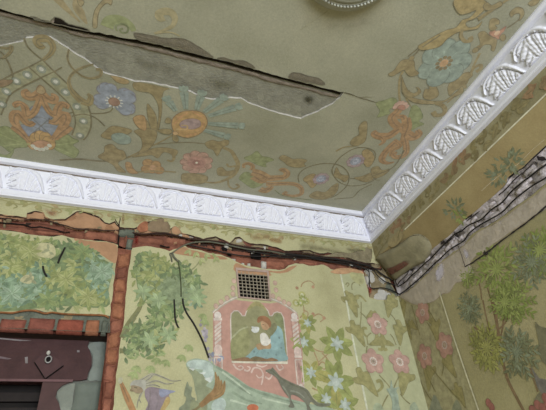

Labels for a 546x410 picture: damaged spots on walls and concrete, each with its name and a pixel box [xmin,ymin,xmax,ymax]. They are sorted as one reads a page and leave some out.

peeling [0,11,342,117]
flaking render [0,148,546,410]